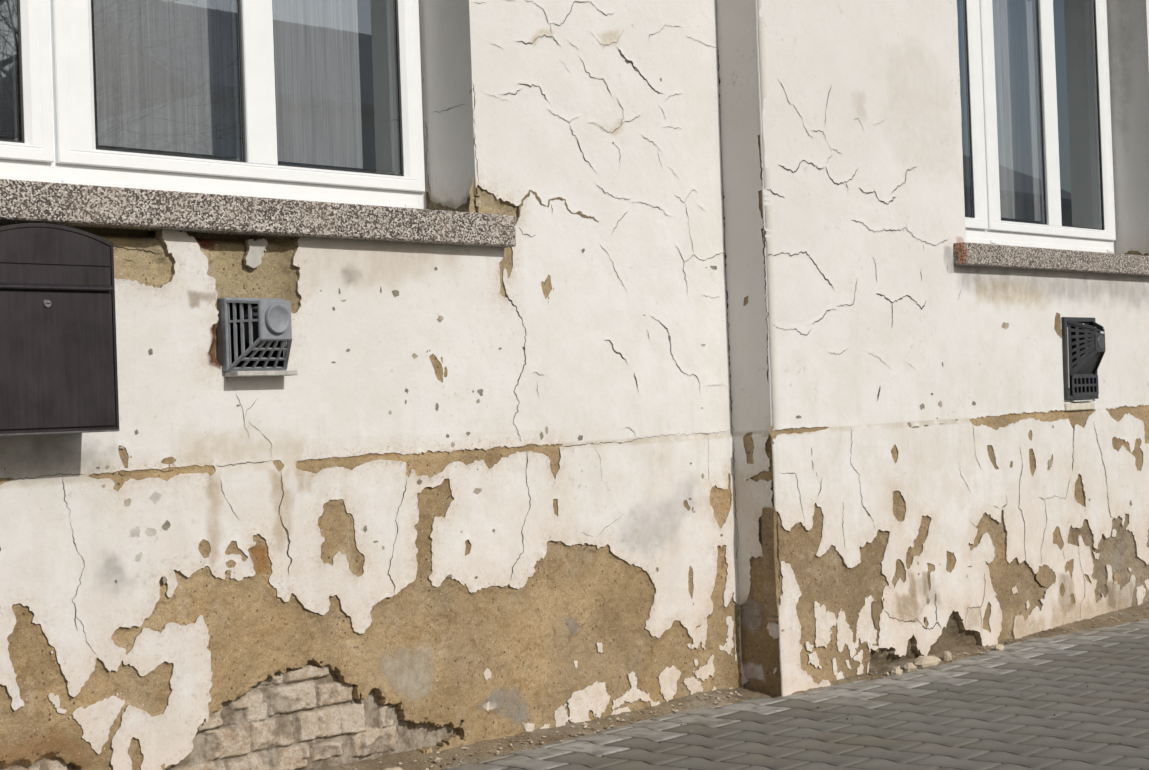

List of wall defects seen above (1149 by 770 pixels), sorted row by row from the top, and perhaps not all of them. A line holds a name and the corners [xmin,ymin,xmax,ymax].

flaking render [67,226,176,288]
flaking render [182,231,302,363]
crack [425,0,739,577]
crack [760,81,948,379]
crack [9,473,95,653]
flaking render [0,415,1149,770]
crack [842,431,874,546]
crack [885,577,941,630]
crack [995,422,1113,618]